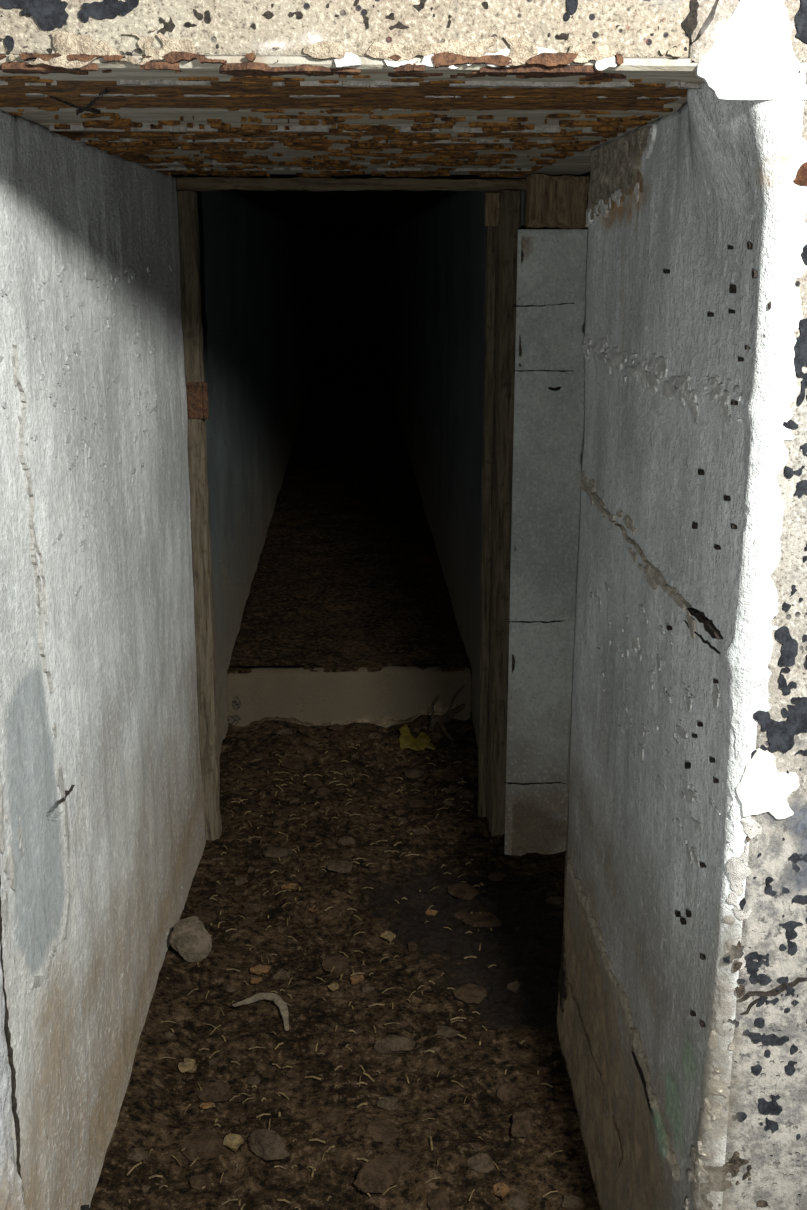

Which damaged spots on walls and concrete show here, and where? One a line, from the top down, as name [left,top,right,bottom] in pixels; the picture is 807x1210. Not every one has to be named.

spalling [0,0,227,87]
spalling [251,4,303,29]
spalling [303,41,345,60]
spalling [354,0,634,88]
spalling [658,47,687,58]
rust [0,62,688,177]
rust [793,162,807,186]
crack [12,345,53,693]
crack [579,470,724,654]
peeling [665,0,807,1210]
leakage [788,805,807,888]
crack [0,876,23,1187]